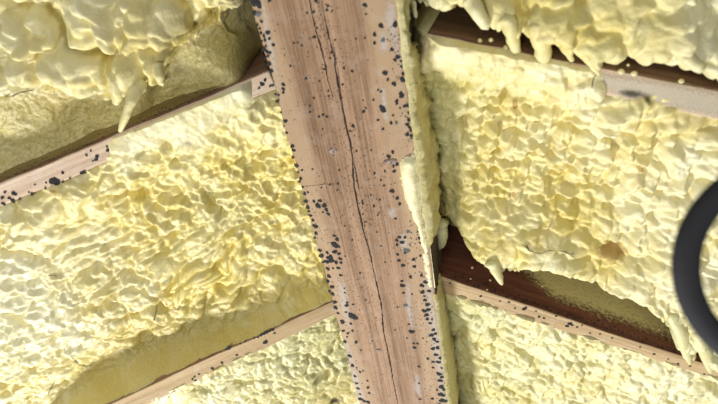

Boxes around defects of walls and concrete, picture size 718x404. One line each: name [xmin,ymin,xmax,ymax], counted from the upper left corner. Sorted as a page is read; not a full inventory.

water stain [250,0,291,134]
water stain [44,171,71,196]
water stain [289,0,418,351]
crack [309,0,398,404]
water stain [369,212,448,404]
water stain [449,275,676,355]
water stain [598,240,625,261]